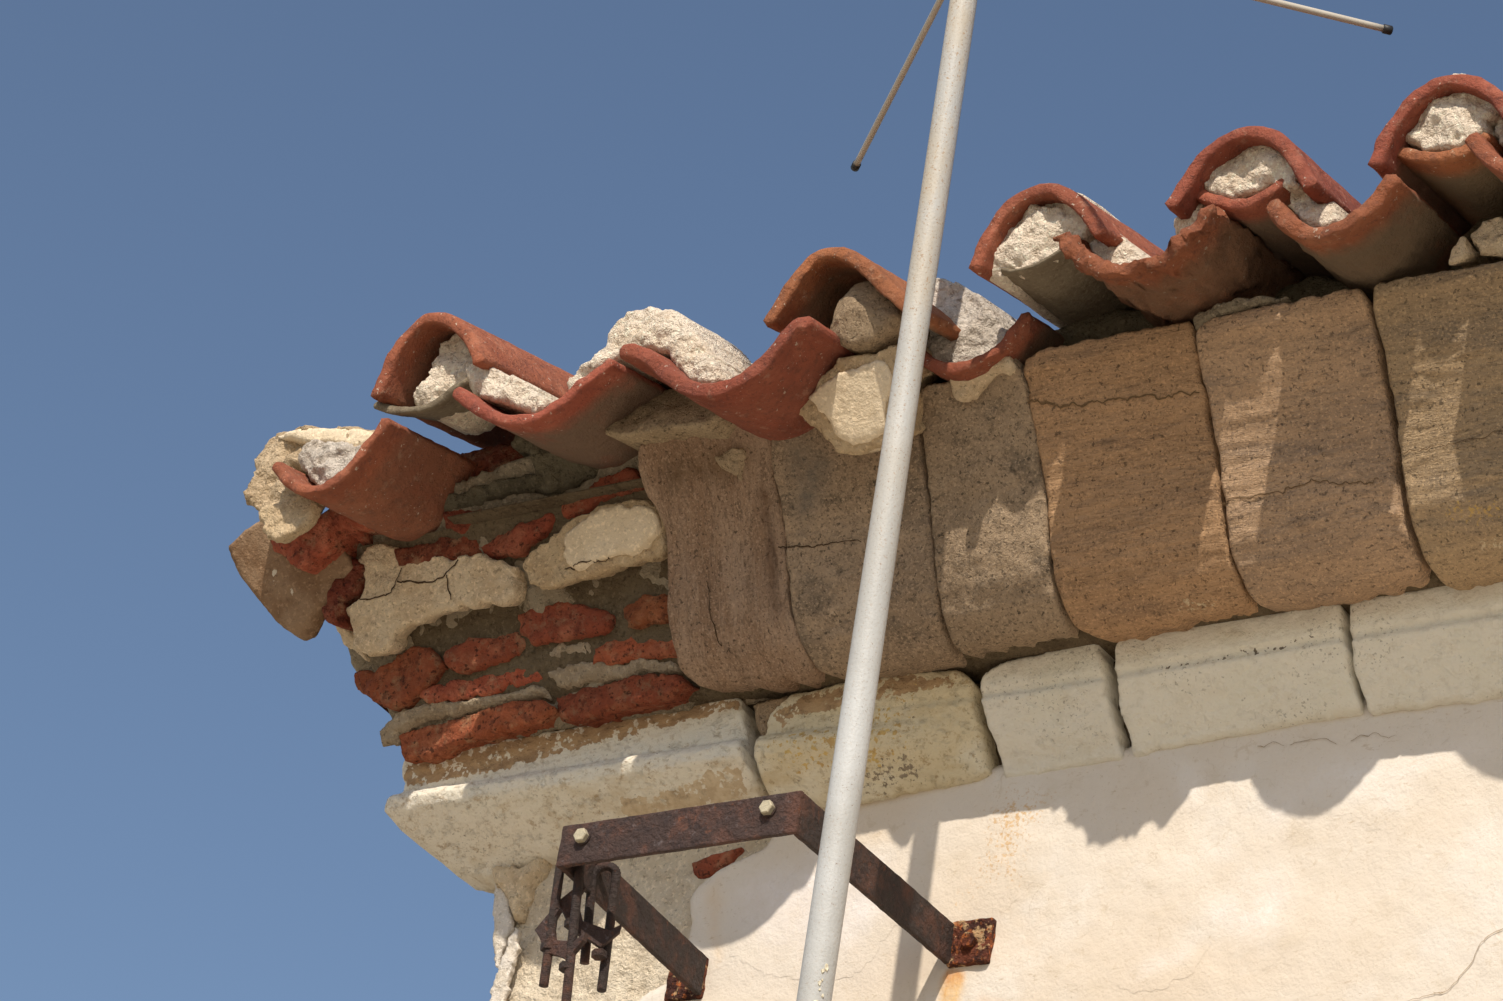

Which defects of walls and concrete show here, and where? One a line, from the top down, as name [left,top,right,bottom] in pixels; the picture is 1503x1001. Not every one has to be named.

crack [1027,390,1200,409]
crack [1222,430,1503,506]
crack [359,559,458,600]
crack [778,540,861,548]
flaking render [611,838,771,939]
flaking render [490,858,669,1001]
corrosion [690,871,729,1001]
corrosion [931,966,973,1001]
crack [1409,928,1503,1001]